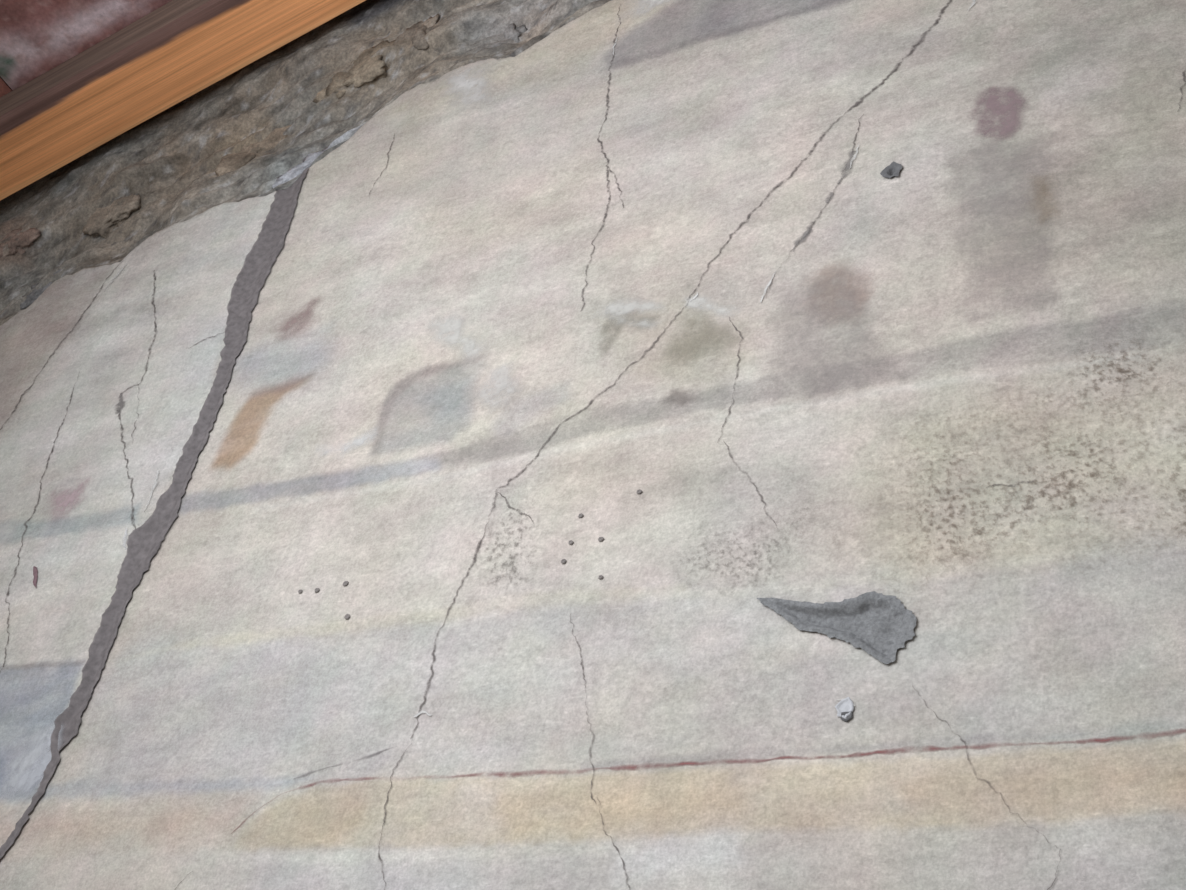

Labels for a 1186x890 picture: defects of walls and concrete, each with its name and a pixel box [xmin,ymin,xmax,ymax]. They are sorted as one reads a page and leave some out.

crack [494,0,975,520]
leakage [978,88,1024,136]
crack [0,167,308,859]
crack [378,536,484,890]
flaking render [757,591,917,664]